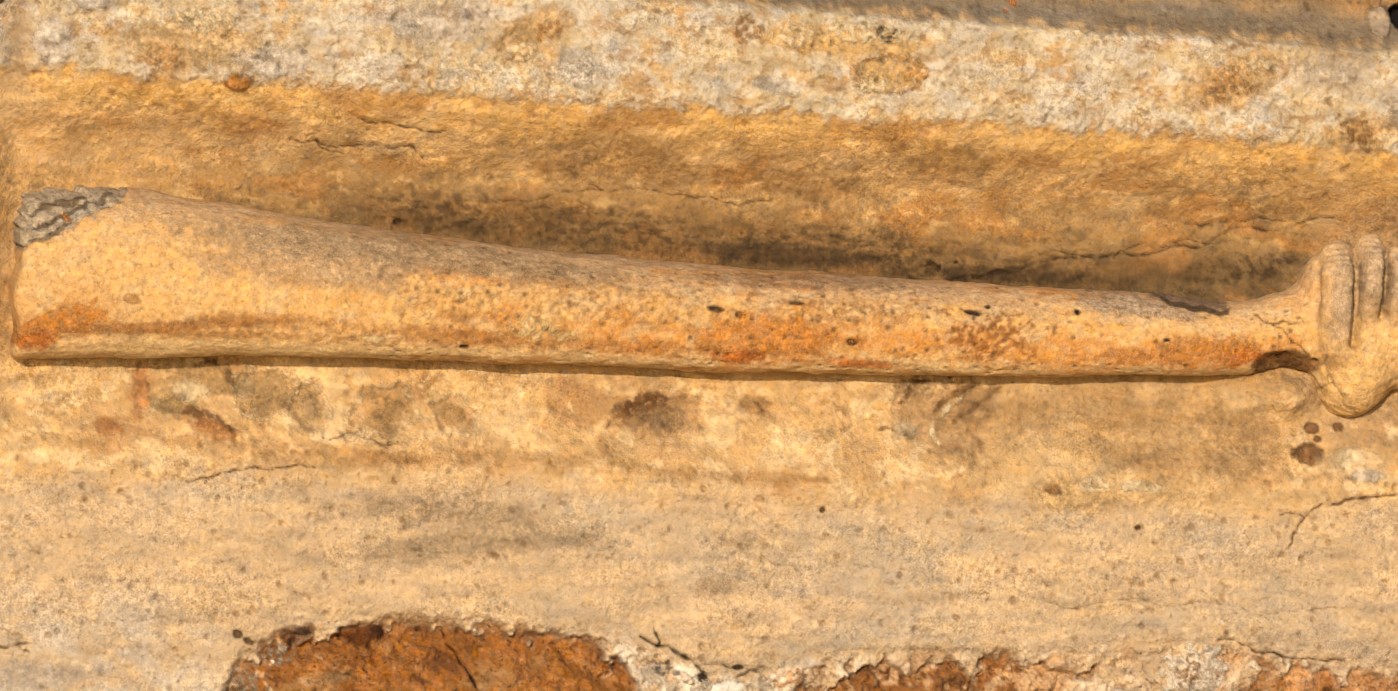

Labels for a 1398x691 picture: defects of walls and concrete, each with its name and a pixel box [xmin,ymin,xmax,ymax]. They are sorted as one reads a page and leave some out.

crack [1281,495,1395,546]
spalling [223,624,314,691]
spalling [342,625,383,646]